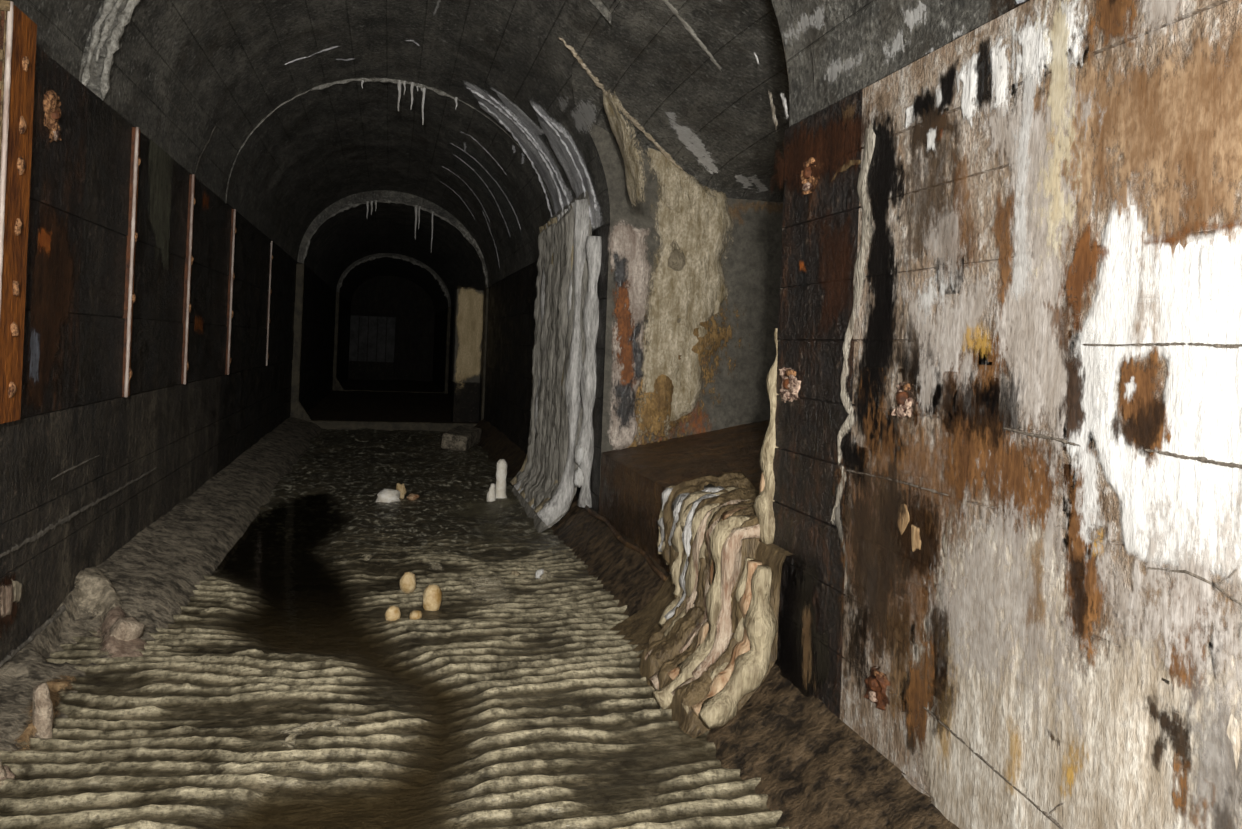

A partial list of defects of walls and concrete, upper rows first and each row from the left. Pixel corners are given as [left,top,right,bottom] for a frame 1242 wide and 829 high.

efflorescence [81,0,141,99]
efflorescence [243,78,455,146]
efflorescence [303,132,521,387]
efflorescence [465,38,750,450]
rust [771,112,869,195]
water stain [778,0,1242,829]
rust [948,0,1242,665]